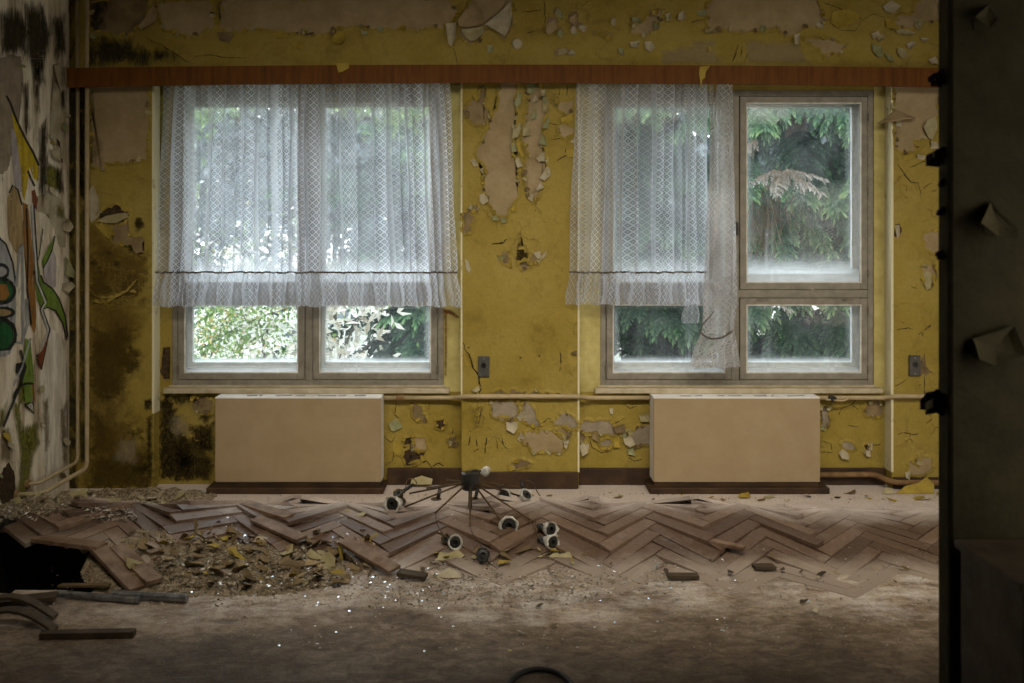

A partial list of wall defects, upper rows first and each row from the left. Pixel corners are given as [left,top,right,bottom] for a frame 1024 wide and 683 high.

mould [89,1,174,66]
peeling [445,0,517,53]
peeling [546,0,861,61]
peeling [89,86,152,172]
peeling [459,83,577,236]
peeling [876,56,946,188]
water stain [56,87,215,488]
peeling [918,207,946,291]
water stain [1,431,11,460]
peeling [389,400,460,468]
crack [384,342,511,468]
peeling [471,386,650,472]